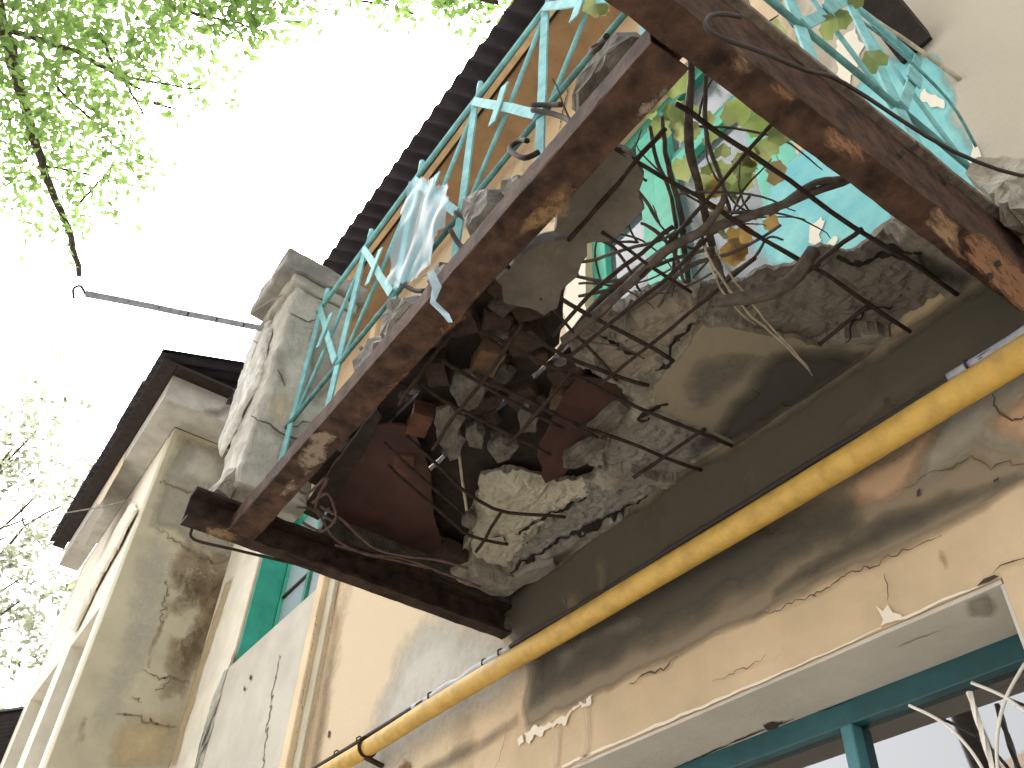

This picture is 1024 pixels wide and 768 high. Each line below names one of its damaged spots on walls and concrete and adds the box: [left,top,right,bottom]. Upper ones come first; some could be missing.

corrosion [826,127,868,158]
corrosion [520,186,569,234]
corrosion [926,208,1024,310]
flaking render [387,88,960,567]
damp [504,259,1024,642]
damp [523,420,1024,726]
crack [753,535,941,617]
crack [117,669,189,729]
damp [116,574,231,765]
crack [262,656,281,768]
peeling [517,695,592,746]
peeling [562,575,999,768]